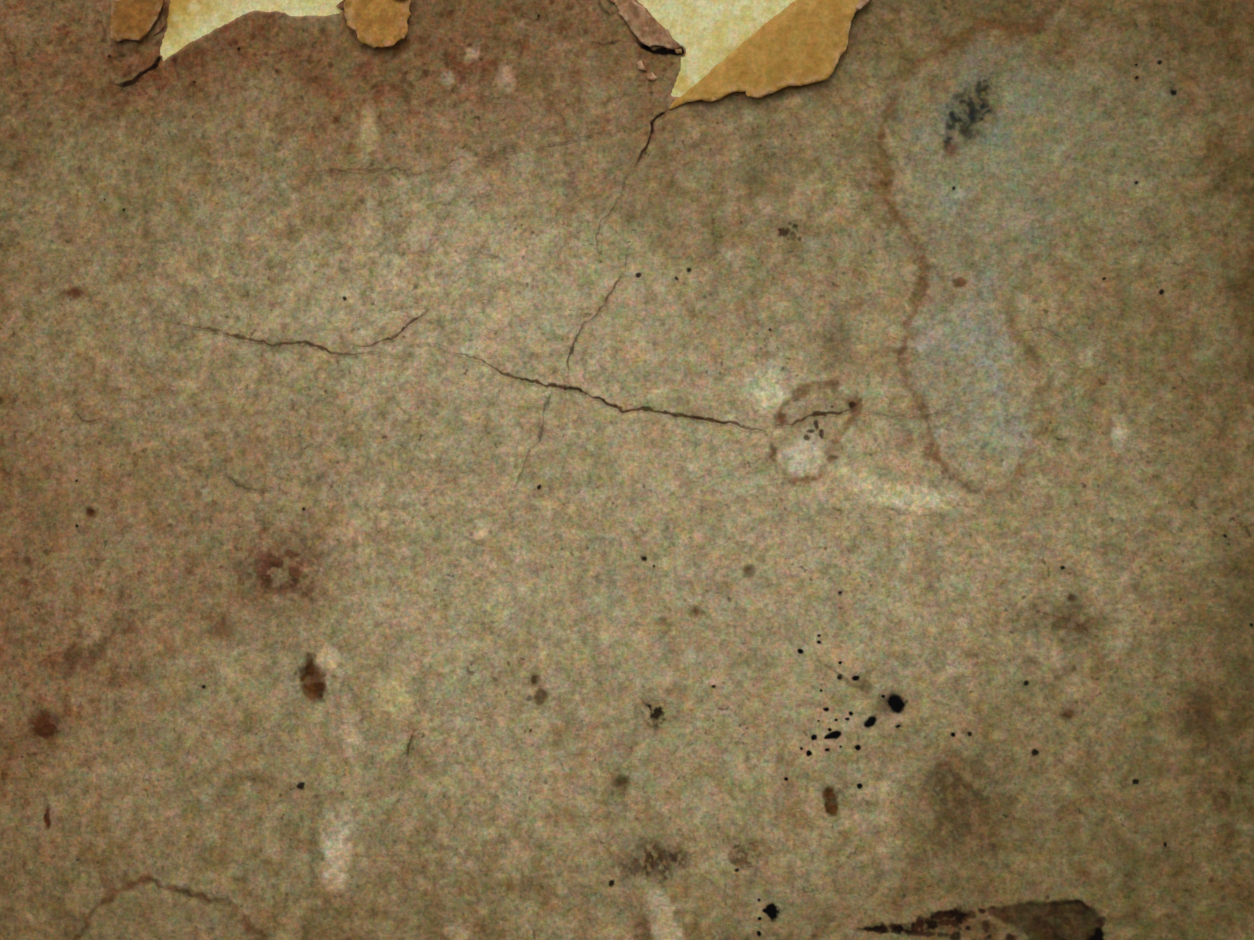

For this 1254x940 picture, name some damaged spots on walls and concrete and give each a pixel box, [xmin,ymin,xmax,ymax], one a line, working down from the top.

peeling [109,0,412,61]
peeling [586,0,870,110]
crack [172,108,955,500]
water stain [763,0,1207,509]
water stain [67,866,278,940]